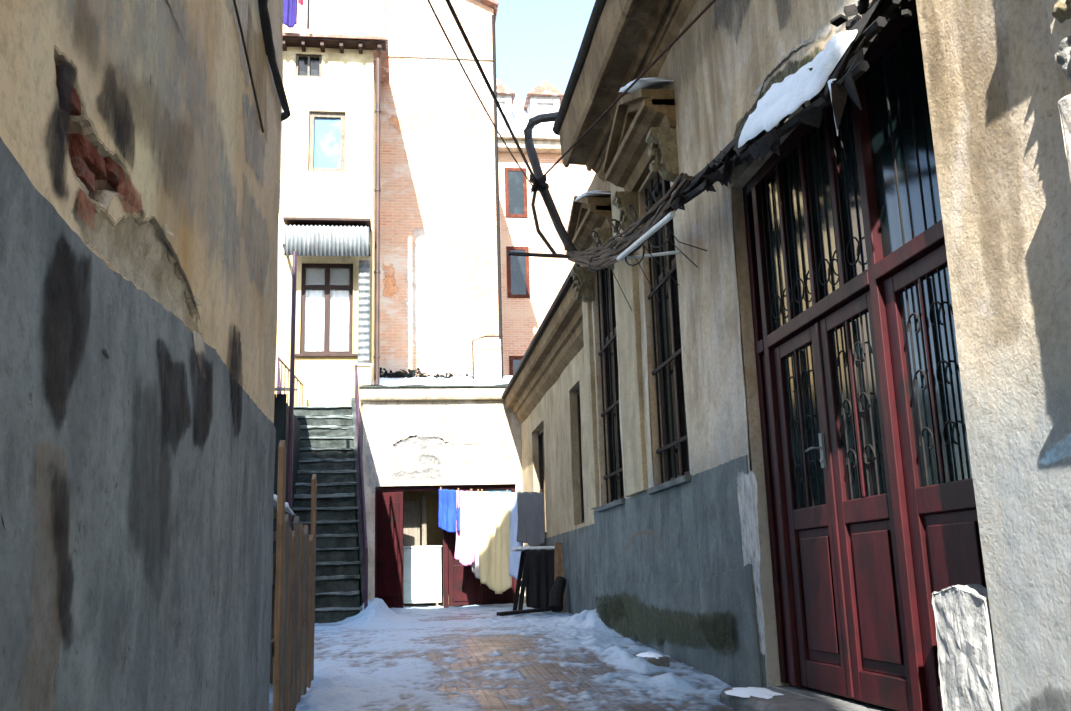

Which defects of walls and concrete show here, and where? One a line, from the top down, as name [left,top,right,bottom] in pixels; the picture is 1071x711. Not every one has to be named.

flaking render [54,45,206,375]
flaking render [391,434,454,482]